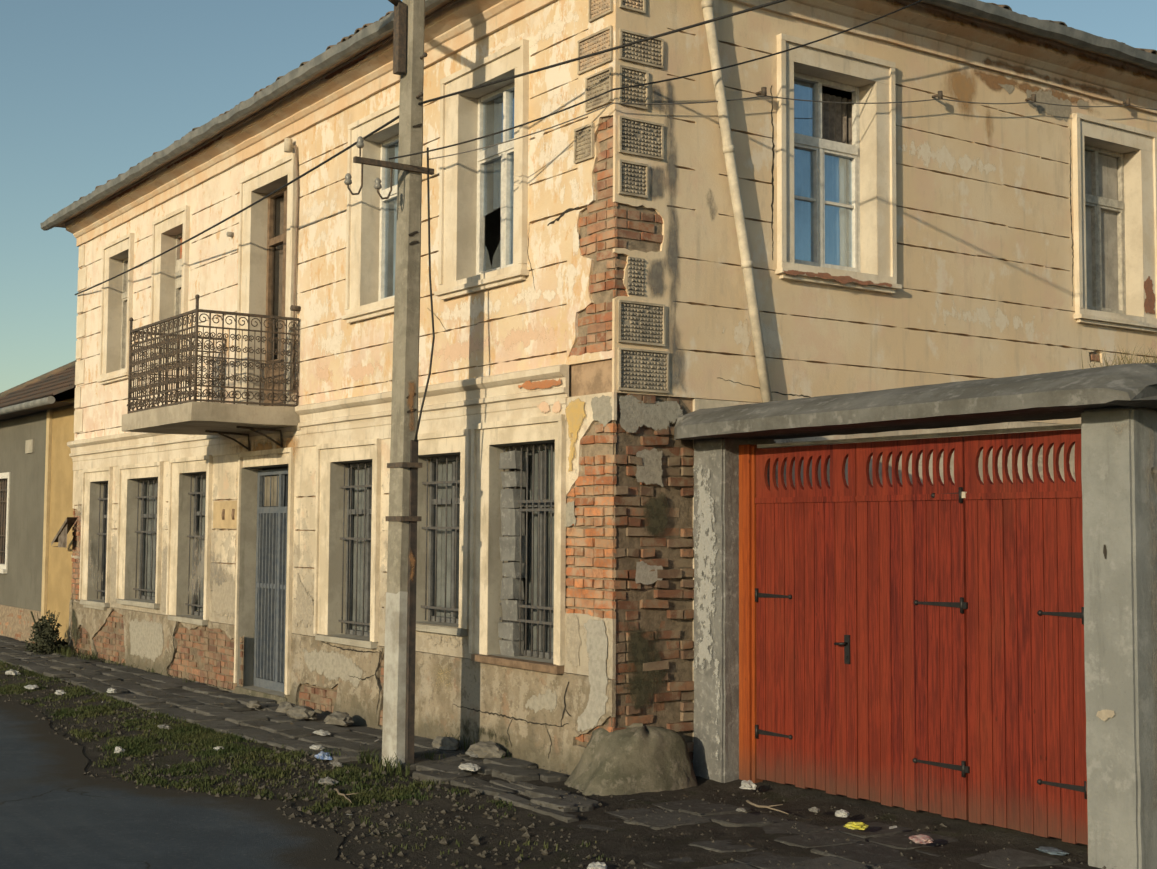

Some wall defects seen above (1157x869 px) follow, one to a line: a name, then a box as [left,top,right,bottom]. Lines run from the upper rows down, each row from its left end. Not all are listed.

spalling [998,83,1089,122]
flaking render [420,89,663,362]
flaking render [71,546,244,690]
spalling [299,648,364,713]
crack [453,681,571,758]
flaking render [518,379,694,767]